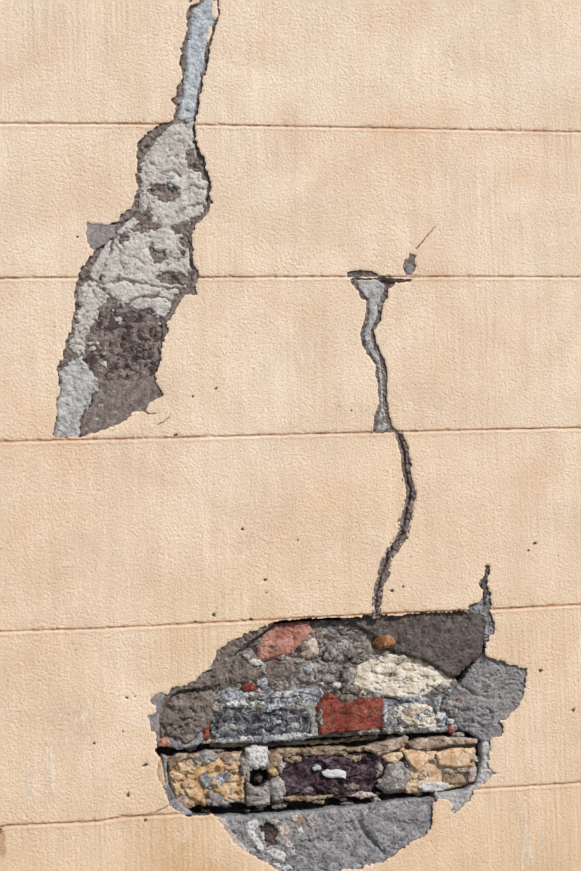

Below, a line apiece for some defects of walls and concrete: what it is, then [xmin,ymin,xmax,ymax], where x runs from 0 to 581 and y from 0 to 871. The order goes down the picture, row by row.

crack [347,270,417,619]
spalling [141,565,527,871]